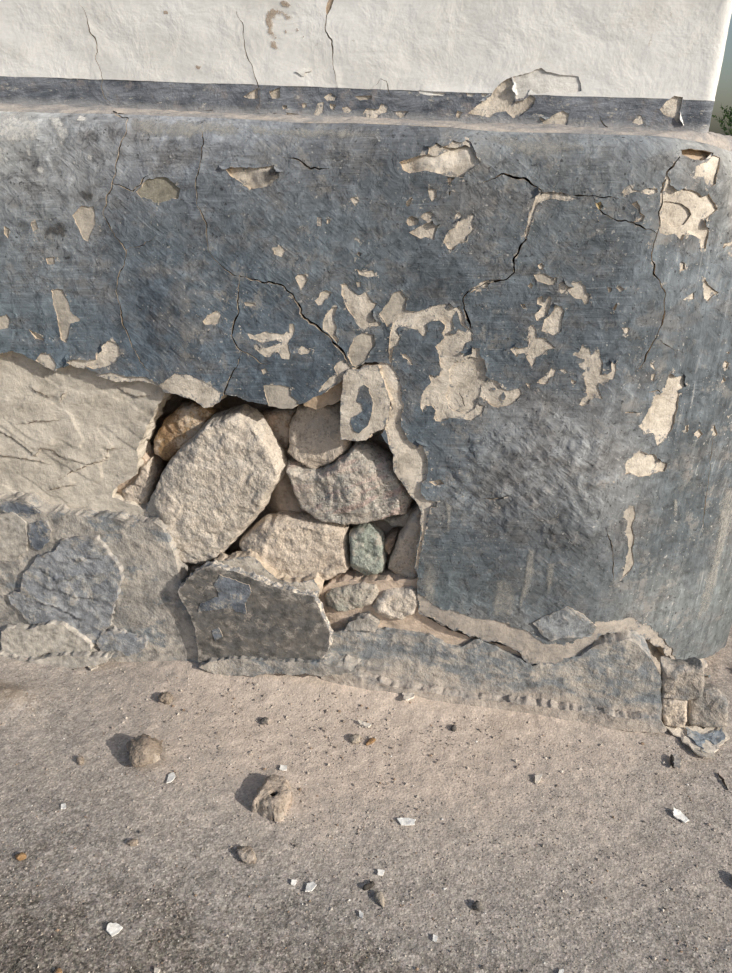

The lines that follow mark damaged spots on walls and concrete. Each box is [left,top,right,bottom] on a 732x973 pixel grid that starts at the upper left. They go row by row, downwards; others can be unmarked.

crack [325,0,336,75]
peeling [456,68,581,118]
peeling [401,139,481,193]
peeling [622,149,719,249]
crack [196,136,351,394]
peeling [248,323,311,359]
crack [0,388,120,490]
peeling [262,263,617,569]
peeling [625,372,687,476]
flaking render [0,341,227,671]
flaking render [178,549,380,677]
peeling [417,593,675,665]